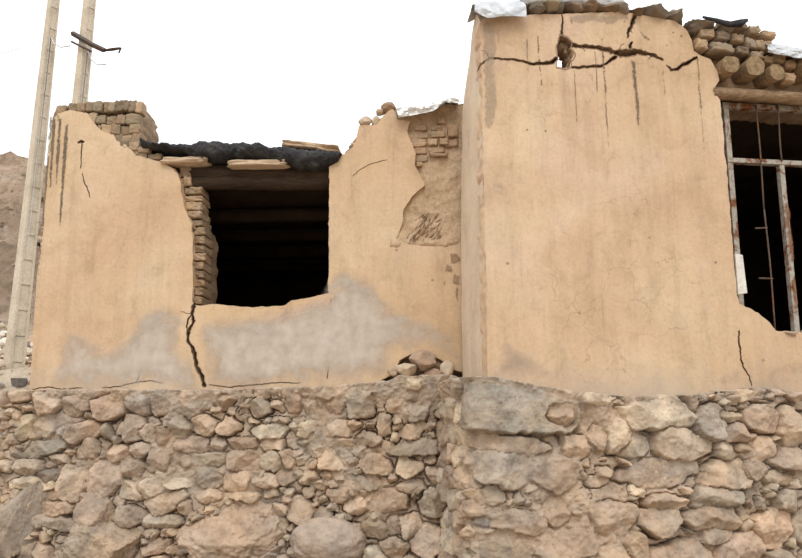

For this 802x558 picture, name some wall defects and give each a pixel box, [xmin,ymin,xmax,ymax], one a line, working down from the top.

crack [477,15,698,71]
damp [631,60,639,124]
damp [39,117,68,256]
crack [78,140,90,197]
flaking render [179,167,215,306]
flaking render [390,104,463,300]
rust [786,203,794,260]
crack [103,376,163,388]
crack [181,304,300,388]
crack [738,330,752,386]